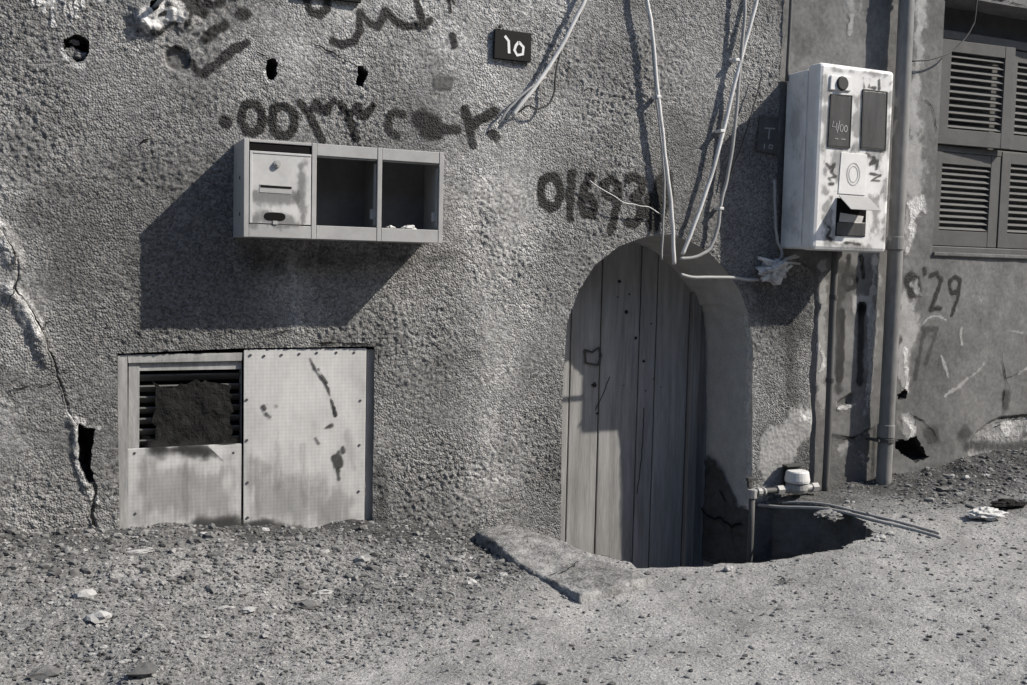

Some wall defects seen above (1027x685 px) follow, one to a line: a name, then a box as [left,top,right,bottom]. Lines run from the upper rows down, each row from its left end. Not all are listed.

spalling [60,38,87,70]
crack [0,220,86,425]
spalling [73,418,101,487]
spalling [895,413,928,463]
flaking render [965,416,1027,456]
crack [83,483,100,527]